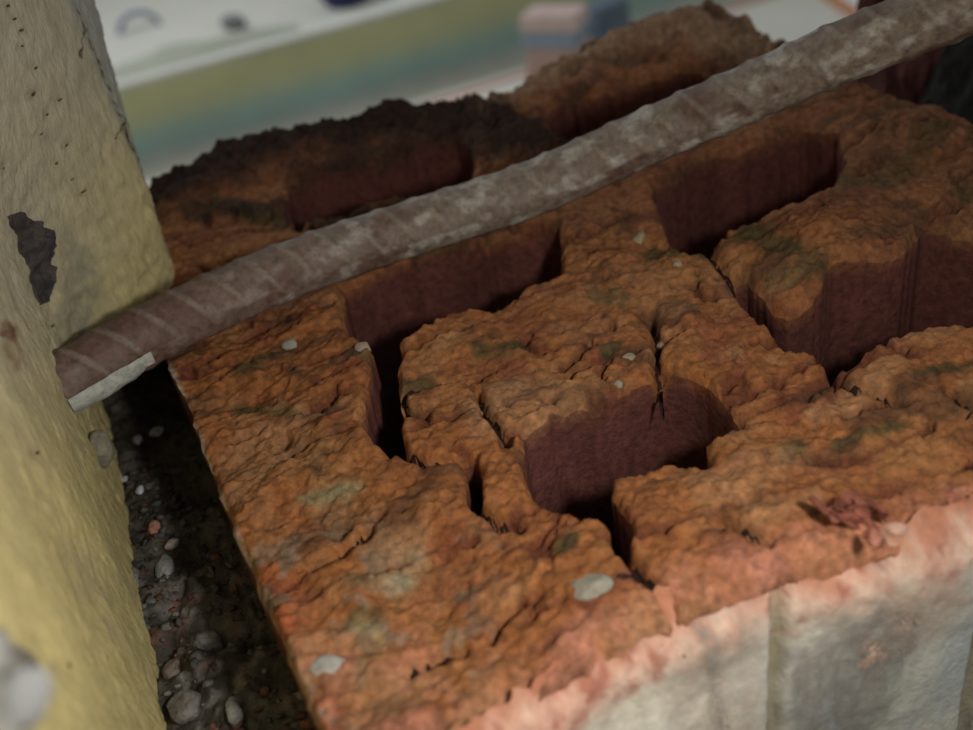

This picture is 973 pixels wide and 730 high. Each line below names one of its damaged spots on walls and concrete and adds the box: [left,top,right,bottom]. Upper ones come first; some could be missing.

spalling [7,212,57,305]
crack [709,259,736,299]
crack [653,333,665,421]
crack [402,384,442,417]
crack [830,385,891,407]
crack [478,402,507,449]
crack [409,455,440,469]
crack [482,513,521,535]
crack [722,528,761,545]
crack [617,568,656,592]
crack [410,657,456,680]
water stain [793,617,915,730]